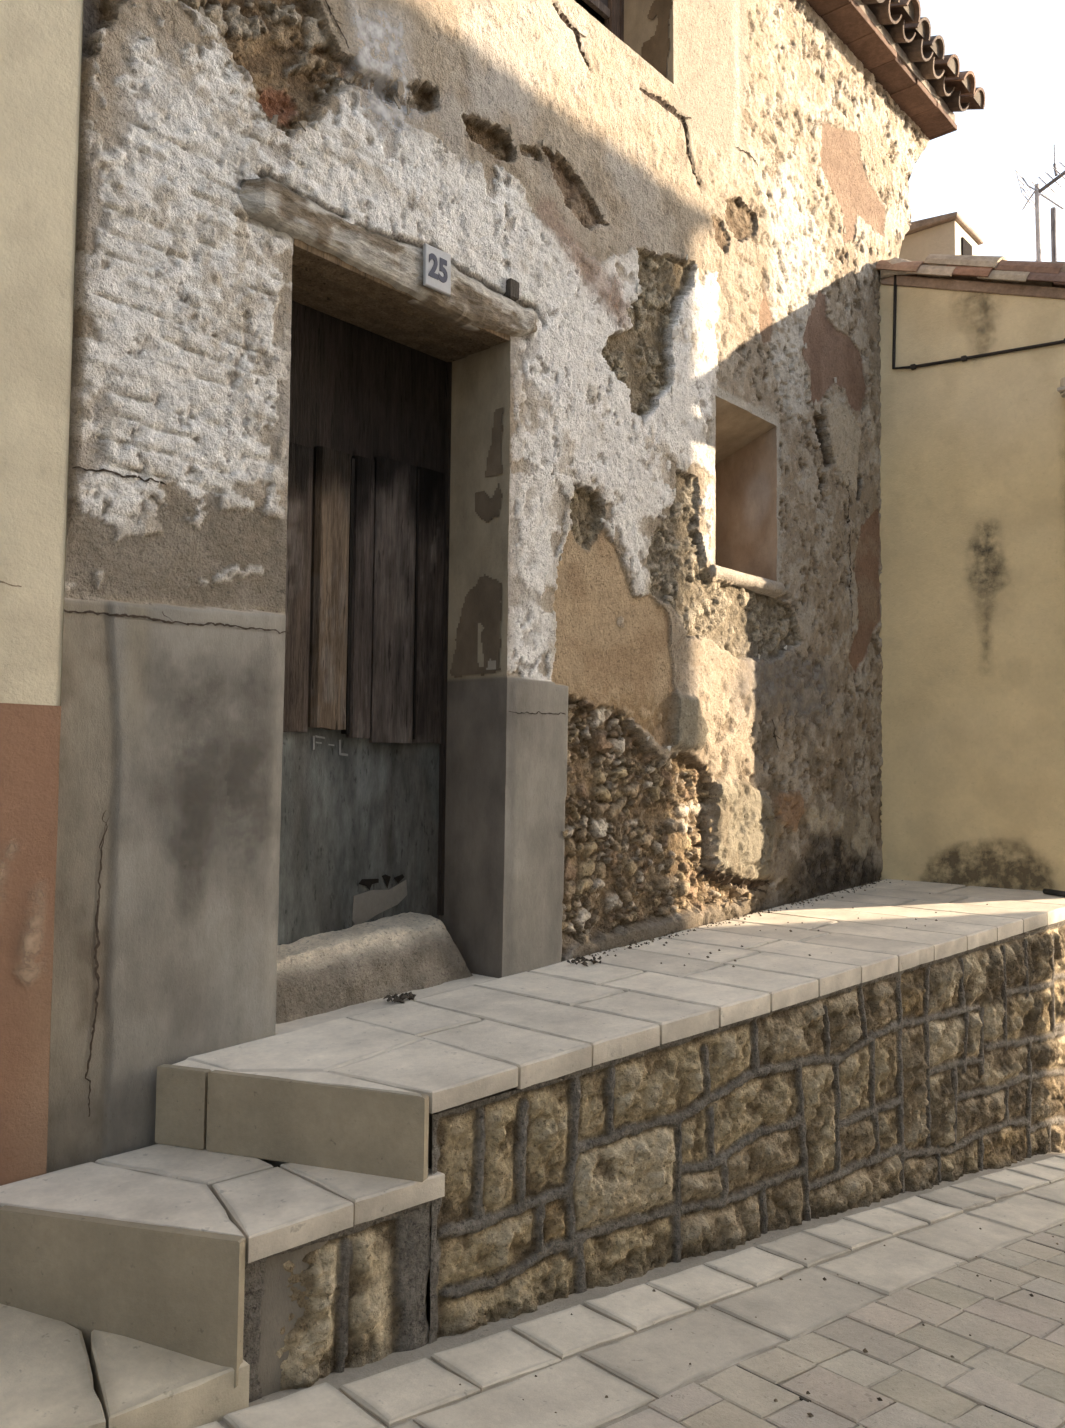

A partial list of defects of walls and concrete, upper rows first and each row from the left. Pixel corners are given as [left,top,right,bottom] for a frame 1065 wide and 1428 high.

spalling [82,0,126,60]
spalling [178,0,440,138]
crack [535,3,589,69]
spalling [461,113,610,231]
crack [639,87,700,185]
spalling [601,247,698,419]
peeling [803,290,867,496]
crack [64,609,289,634]
peeling [551,469,803,752]
damp [973,526,1000,583]
damp [928,842,1052,891]
crack [85,811,109,1117]